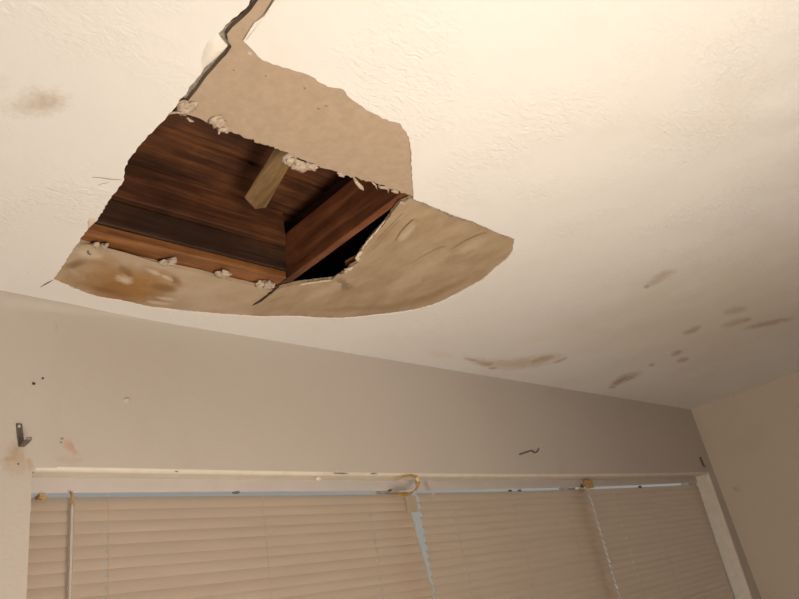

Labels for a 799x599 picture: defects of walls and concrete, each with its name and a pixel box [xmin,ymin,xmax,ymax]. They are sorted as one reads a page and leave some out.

peeling [243,0,279,42]
peeling [201,34,227,69]
damp [0,71,87,123]
damp [54,243,198,311]
damp [457,165,799,396]